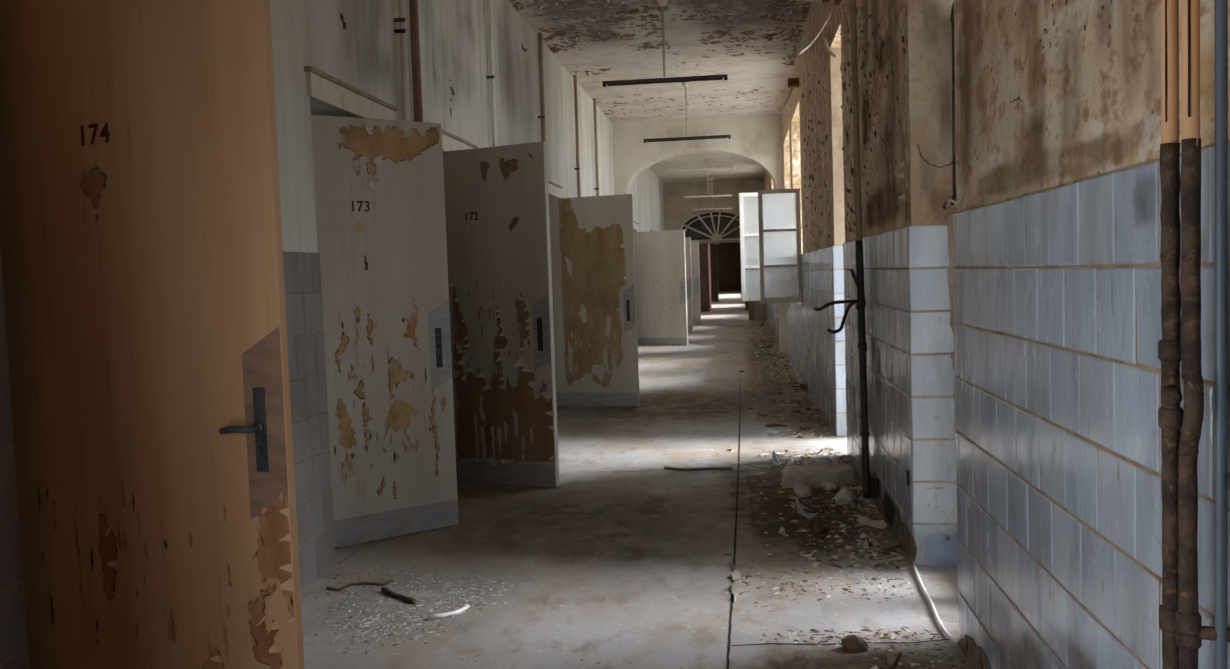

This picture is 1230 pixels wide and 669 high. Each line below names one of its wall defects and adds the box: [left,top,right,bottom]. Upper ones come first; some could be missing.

peeling [509,0,811,68]
crack [1165,0,1191,122]
peeling [336,119,442,192]
peeling [480,151,534,183]
peeling [592,87,785,119]
peeling [839,5,906,234]
crack [917,145,953,168]
water stain [1075,139,1120,164]
peeling [558,198,626,388]
peeling [333,281,556,499]